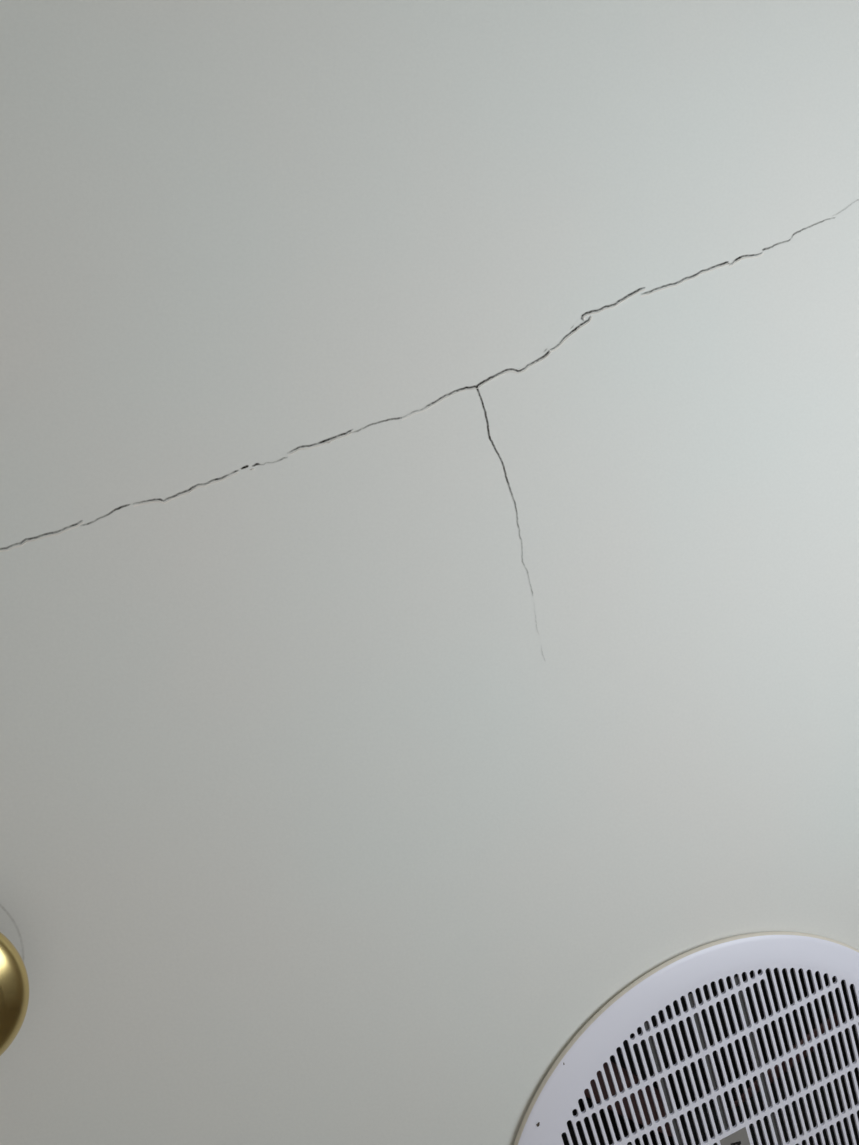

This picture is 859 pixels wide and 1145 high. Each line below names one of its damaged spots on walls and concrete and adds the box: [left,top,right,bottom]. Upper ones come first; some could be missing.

crack [0,430,355,552]
crack [386,229,804,511]